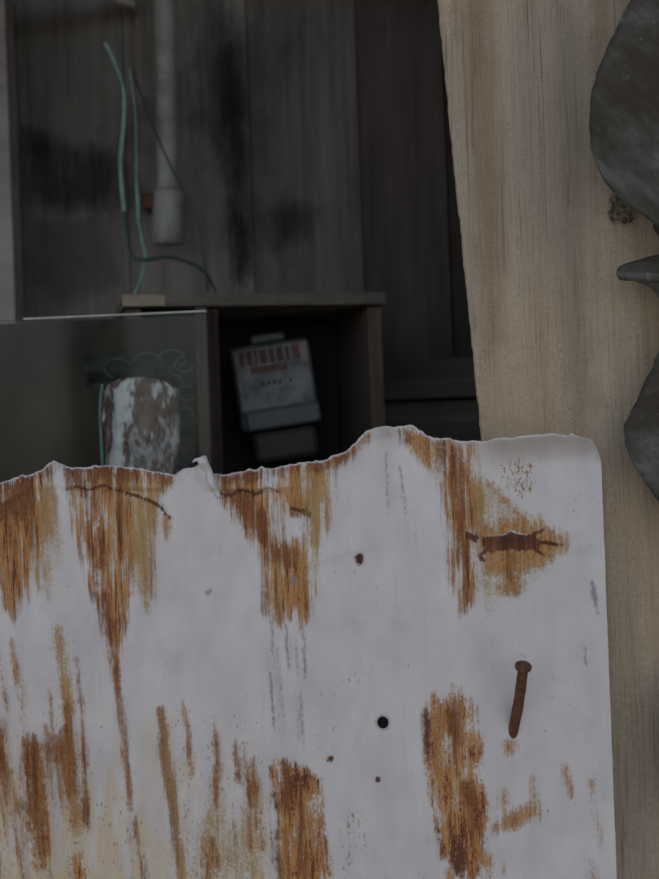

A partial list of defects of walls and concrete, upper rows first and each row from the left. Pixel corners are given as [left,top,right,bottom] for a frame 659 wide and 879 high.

rust [0,465,172,805]
rust [217,433,370,629]
rust [399,431,569,613]
peeling [466,527,563,562]
rust [0,729,48,869]
rust [55,627,89,838]
rust [68,852,87,879]
rust [157,706,331,879]
rust [422,689,541,879]